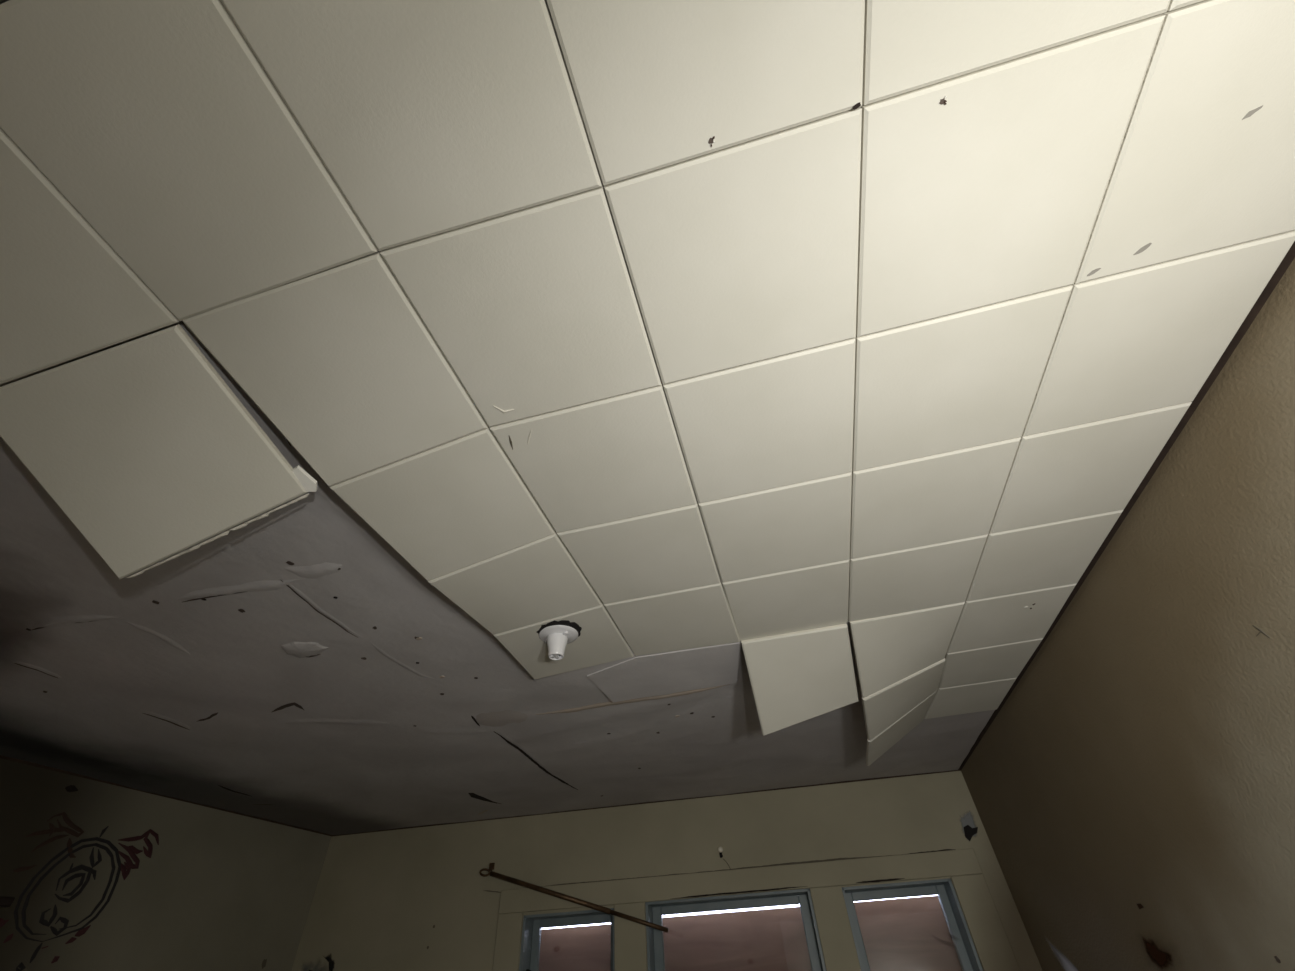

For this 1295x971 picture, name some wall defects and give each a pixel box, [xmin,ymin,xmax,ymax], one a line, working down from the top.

spalling [127,494,309,578]
crack [471,716,578,790]